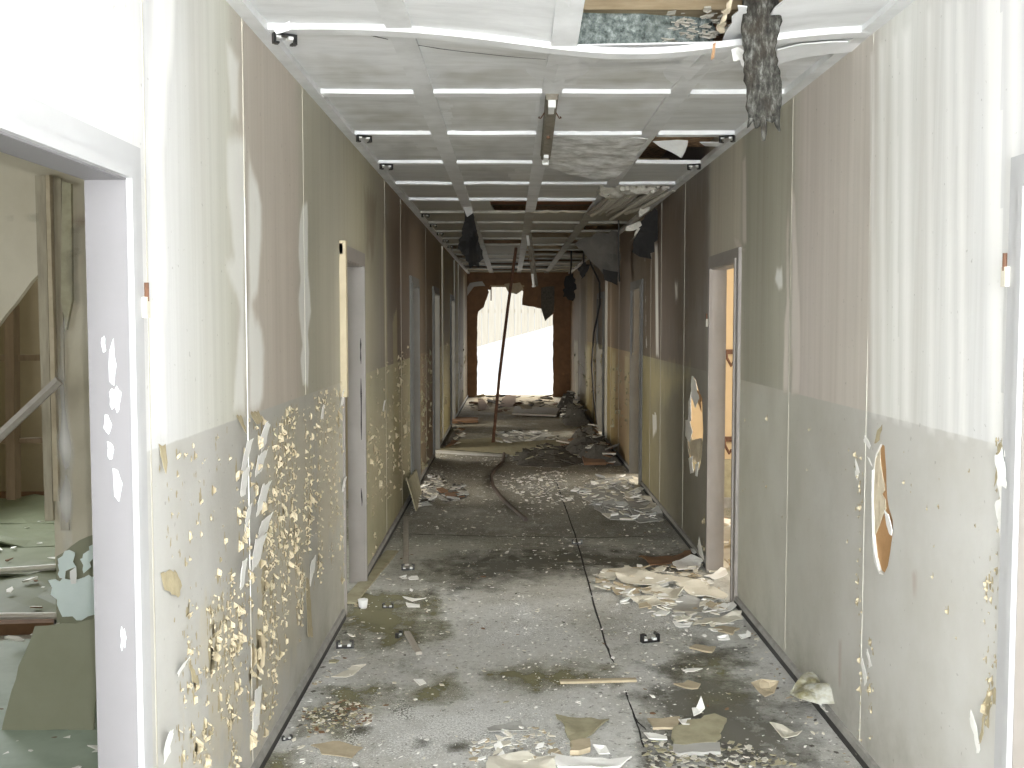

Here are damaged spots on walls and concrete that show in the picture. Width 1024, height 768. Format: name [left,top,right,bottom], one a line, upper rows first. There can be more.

peeling [101,337,122,501]
peeling [159,373,347,768]
peeling [366,343,467,556]
leakage [267,666,630,768]
leakage [342,548,816,768]
spalling [685,376,703,476]
spalling [845,425,893,575]
peeling [970,552,998,753]
peeling [994,437,1007,535]